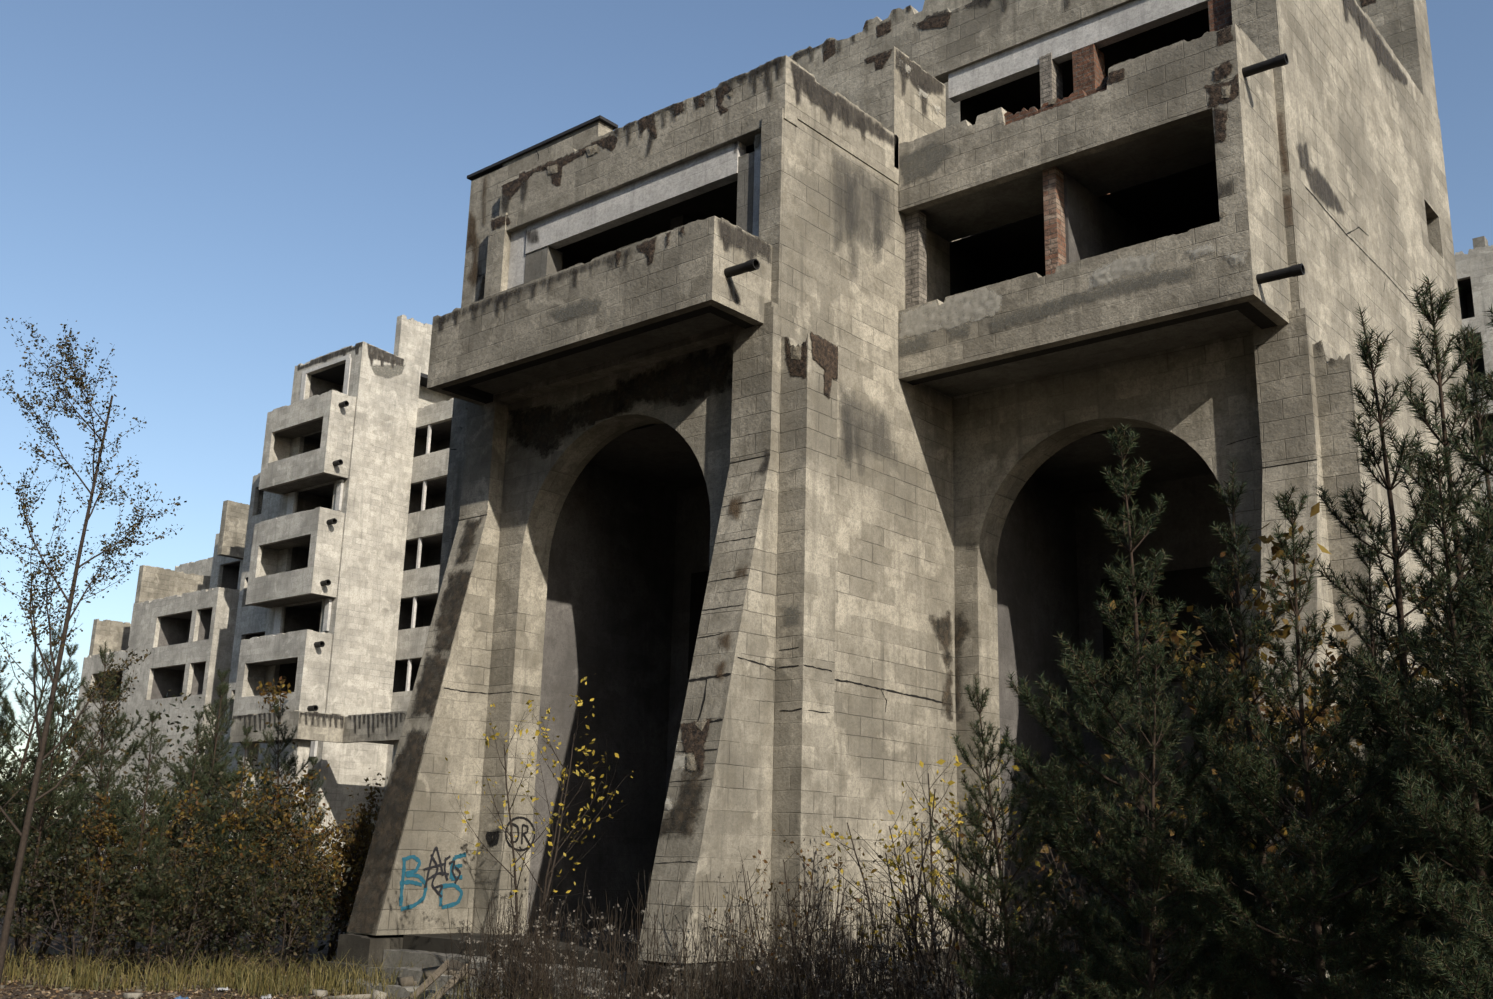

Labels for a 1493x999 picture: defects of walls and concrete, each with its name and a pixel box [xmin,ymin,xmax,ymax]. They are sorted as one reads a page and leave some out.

spalling [491,135,618,242]
spalling [637,115,657,154]
damp [611,0,975,184]
spalling [863,20,911,72]
spalling [1204,26,1239,144]
damp [1297,143,1344,213]
damp [1343,0,1408,85]
spalling [785,332,838,398]
crack [715,499,761,544]
damp [299,518,482,934]
crack [672,575,953,782]
damp [931,611,970,719]